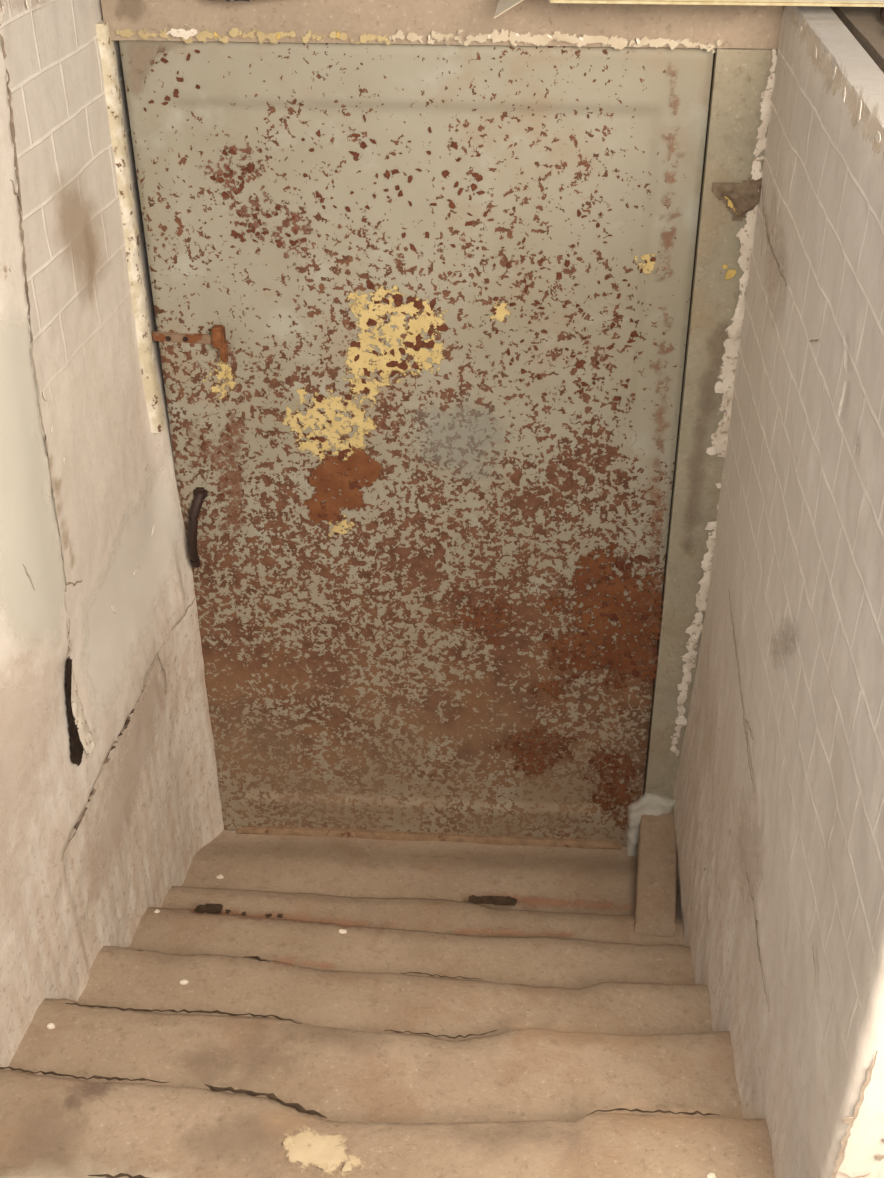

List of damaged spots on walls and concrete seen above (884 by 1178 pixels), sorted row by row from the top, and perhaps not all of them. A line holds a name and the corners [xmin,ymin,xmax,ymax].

rust [200,142,312,268]
rust [316,169,422,223]
rust [430,141,489,226]
peeling [706,49,777,459]
peeling [282,281,449,461]
rust [302,446,383,524]
rust [528,342,673,716]
peeling [670,473,723,756]
crack [66,1003,300,1024]
crack [0,1067,167,1083]
crack [205,1084,327,1118]
crack [88,1170,147,1178]